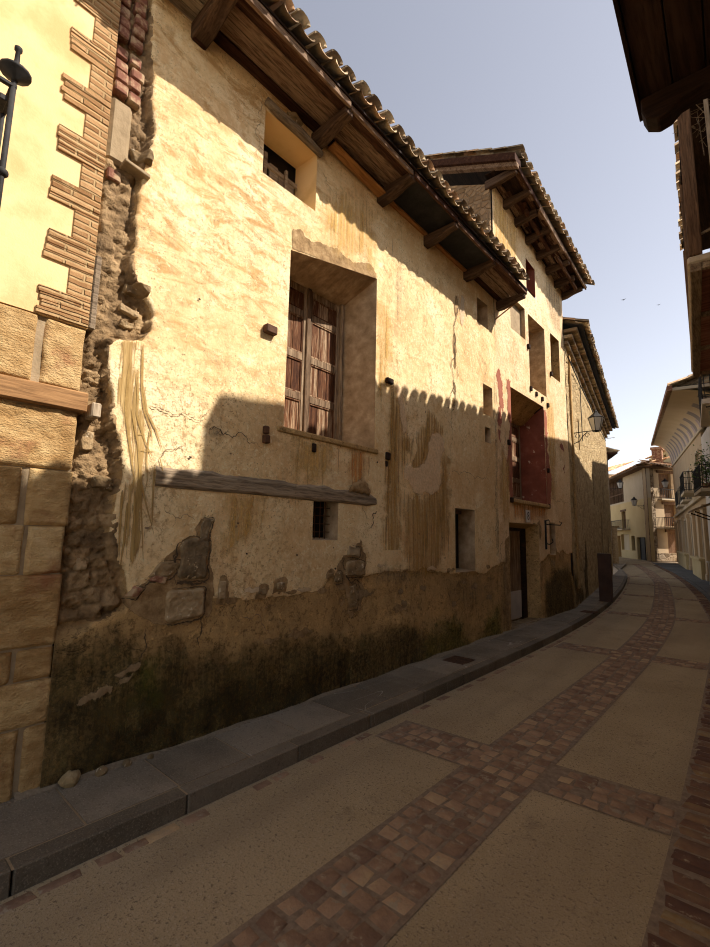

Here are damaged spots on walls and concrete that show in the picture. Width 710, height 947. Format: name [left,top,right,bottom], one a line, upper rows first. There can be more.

flaking render [117,282,151,330]
flaking render [79,430,94,452]
crack [450,296,500,560]
flaking render [121,517,237,626]
flaking render [317,541,385,618]